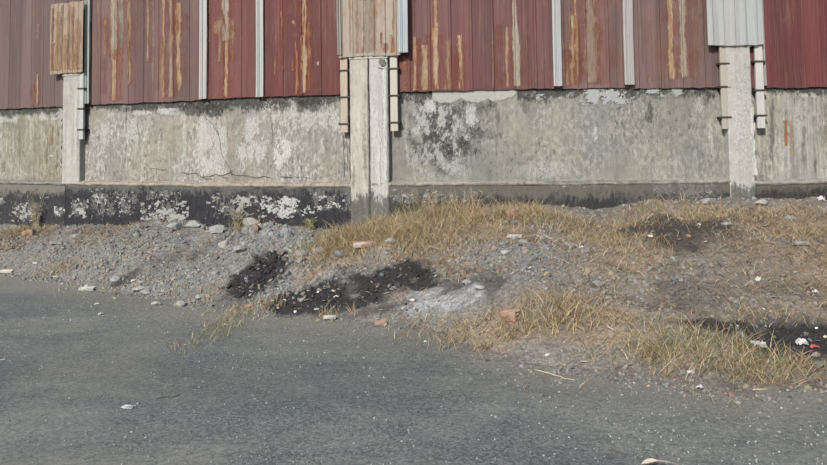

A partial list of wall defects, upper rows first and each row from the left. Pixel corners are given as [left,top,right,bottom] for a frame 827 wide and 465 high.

corrosion [160,0,183,98]
corrosion [218,0,236,97]
corrosion [274,0,319,95]
corrosion [401,0,463,91]
corrosion [505,0,521,88]
corrosion [566,0,600,86]
corrosion [666,0,689,80]
crack [149,117,306,180]
leakage [401,91,479,177]
leakage [517,87,720,103]
peeling [0,198,42,237]
peeling [54,187,189,221]